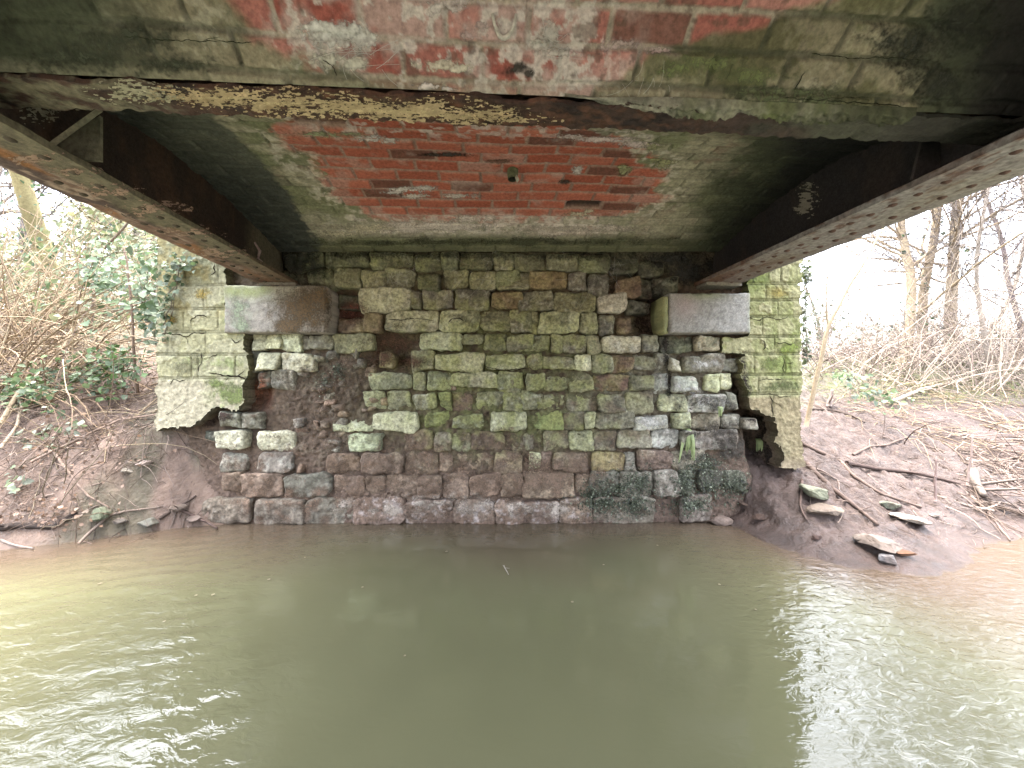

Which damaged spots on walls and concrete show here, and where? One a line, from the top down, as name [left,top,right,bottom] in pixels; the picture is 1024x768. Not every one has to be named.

peeling [75,78,564,127]
spalling [270,325,425,457]
spalling [744,415,772,465]